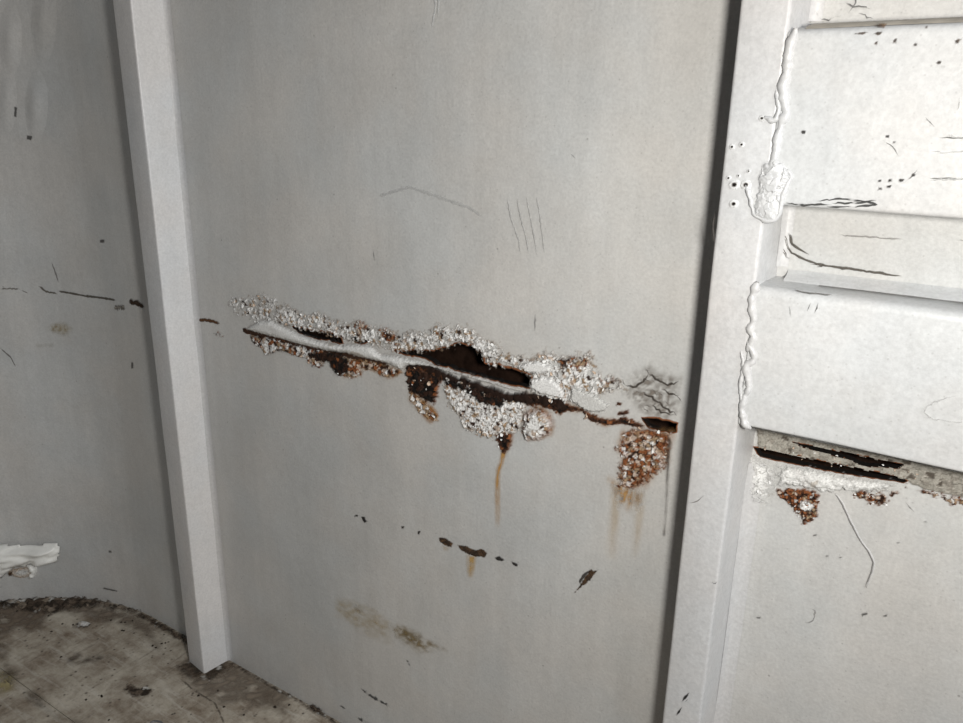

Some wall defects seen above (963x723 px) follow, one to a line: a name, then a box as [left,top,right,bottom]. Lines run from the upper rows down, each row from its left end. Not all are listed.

rust [243,328,567,421]
peeling [228,295,623,412]
peeling [443,377,526,439]
rust [496,433,512,488]
rust [615,427,671,504]
spalling [648,418,677,429]
crack [835,493,875,588]